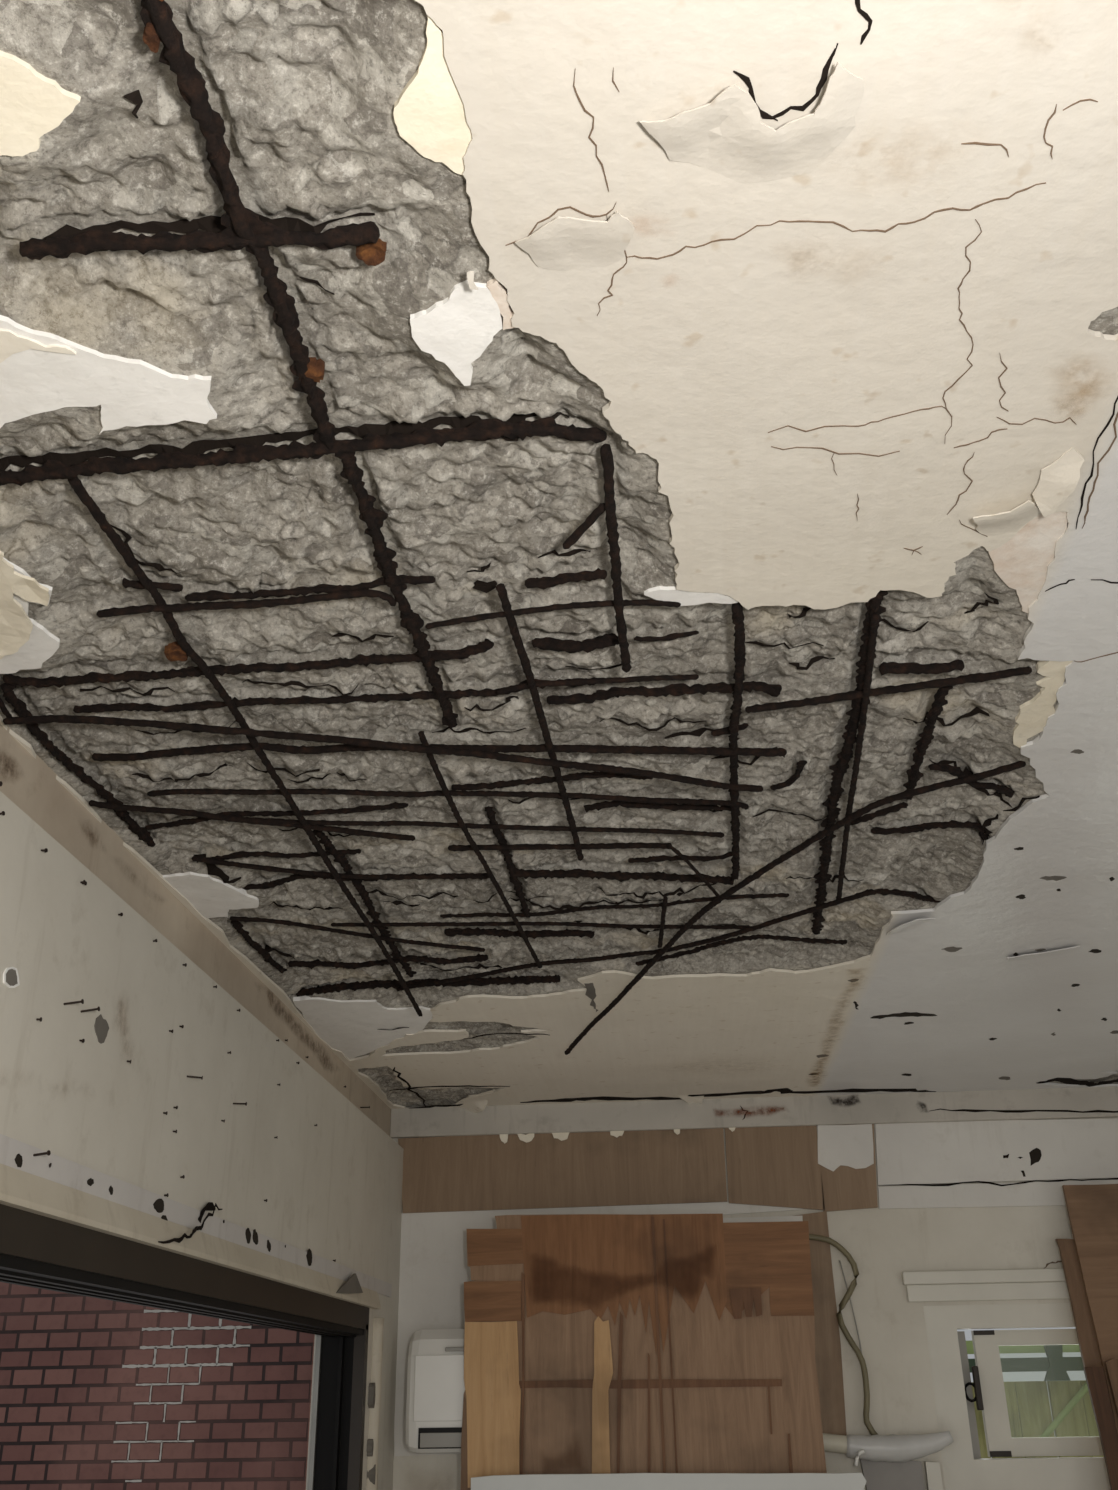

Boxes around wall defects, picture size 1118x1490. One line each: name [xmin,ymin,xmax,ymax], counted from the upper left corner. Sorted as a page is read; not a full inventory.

crack [733,0,872,121]
crack [506,68,1118,537]
spalling [1088,307,1118,335]
spalling [0,0,1085,1107]
crack [463,1032,548,1040]
crack [392,1067,1118,1119]
spalling [1051,1071,1118,1084]
crack [898,1178,1118,1186]
crack [158,1202,223,1244]